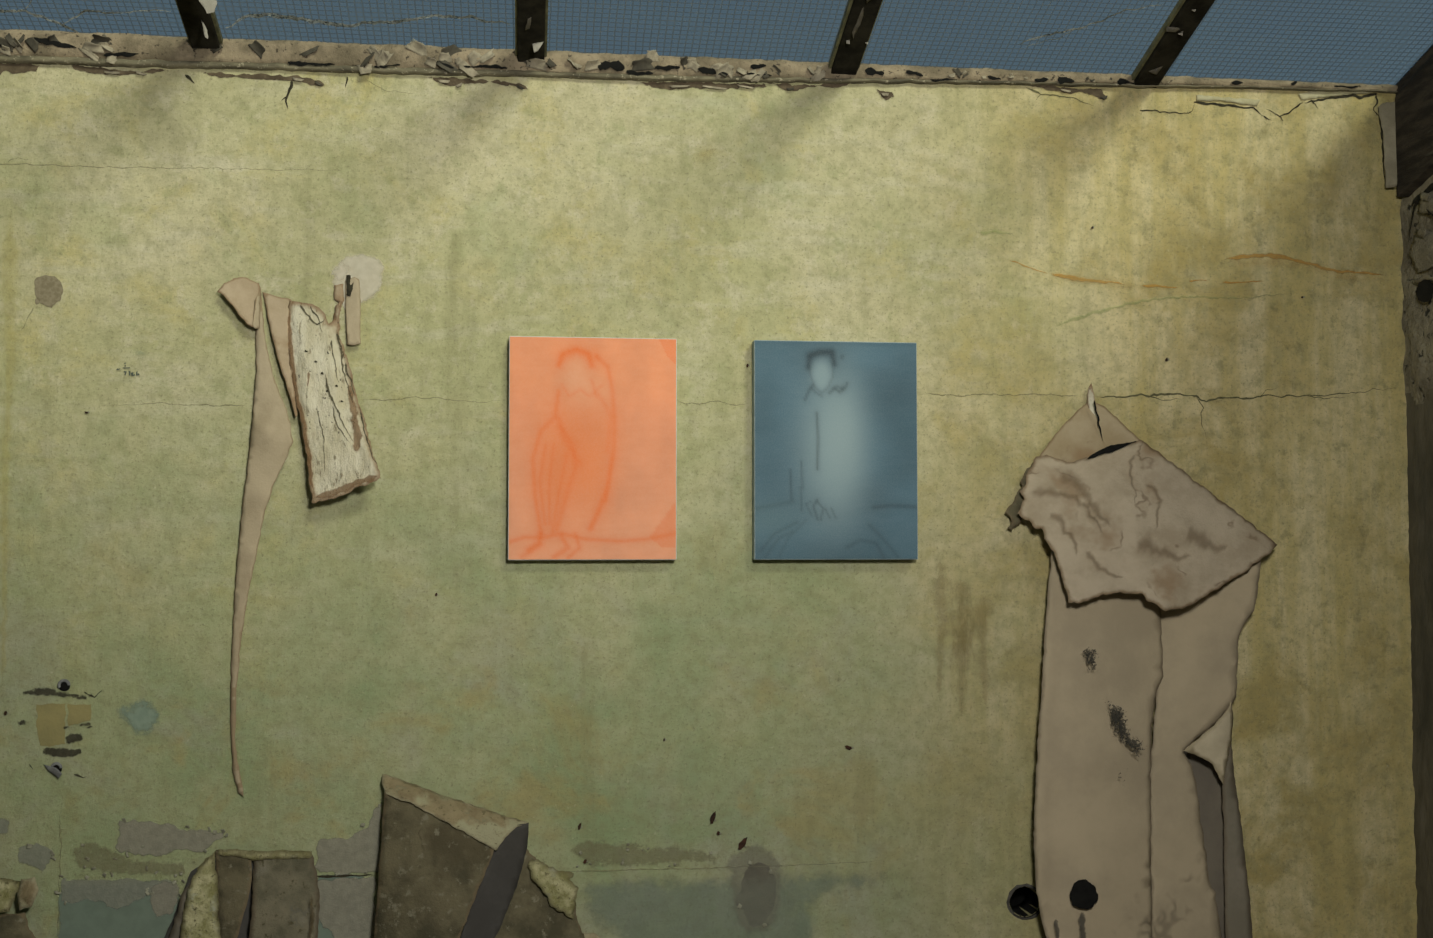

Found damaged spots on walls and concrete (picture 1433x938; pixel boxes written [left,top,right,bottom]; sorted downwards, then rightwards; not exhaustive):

flaking render [0,33,164,76]
flaking render [357,17,850,91]
peeling [865,67,894,100]
flaking render [906,68,1135,99]
crack [1140,91,1385,179]
peeling [34,275,63,308]
peeling [346,275,354,296]
corrosion [1012,261,1121,284]
corrosion [1228,253,1380,275]
crack [1101,388,1392,436]
spalling [43,723,90,757]
peeling [315,804,382,938]